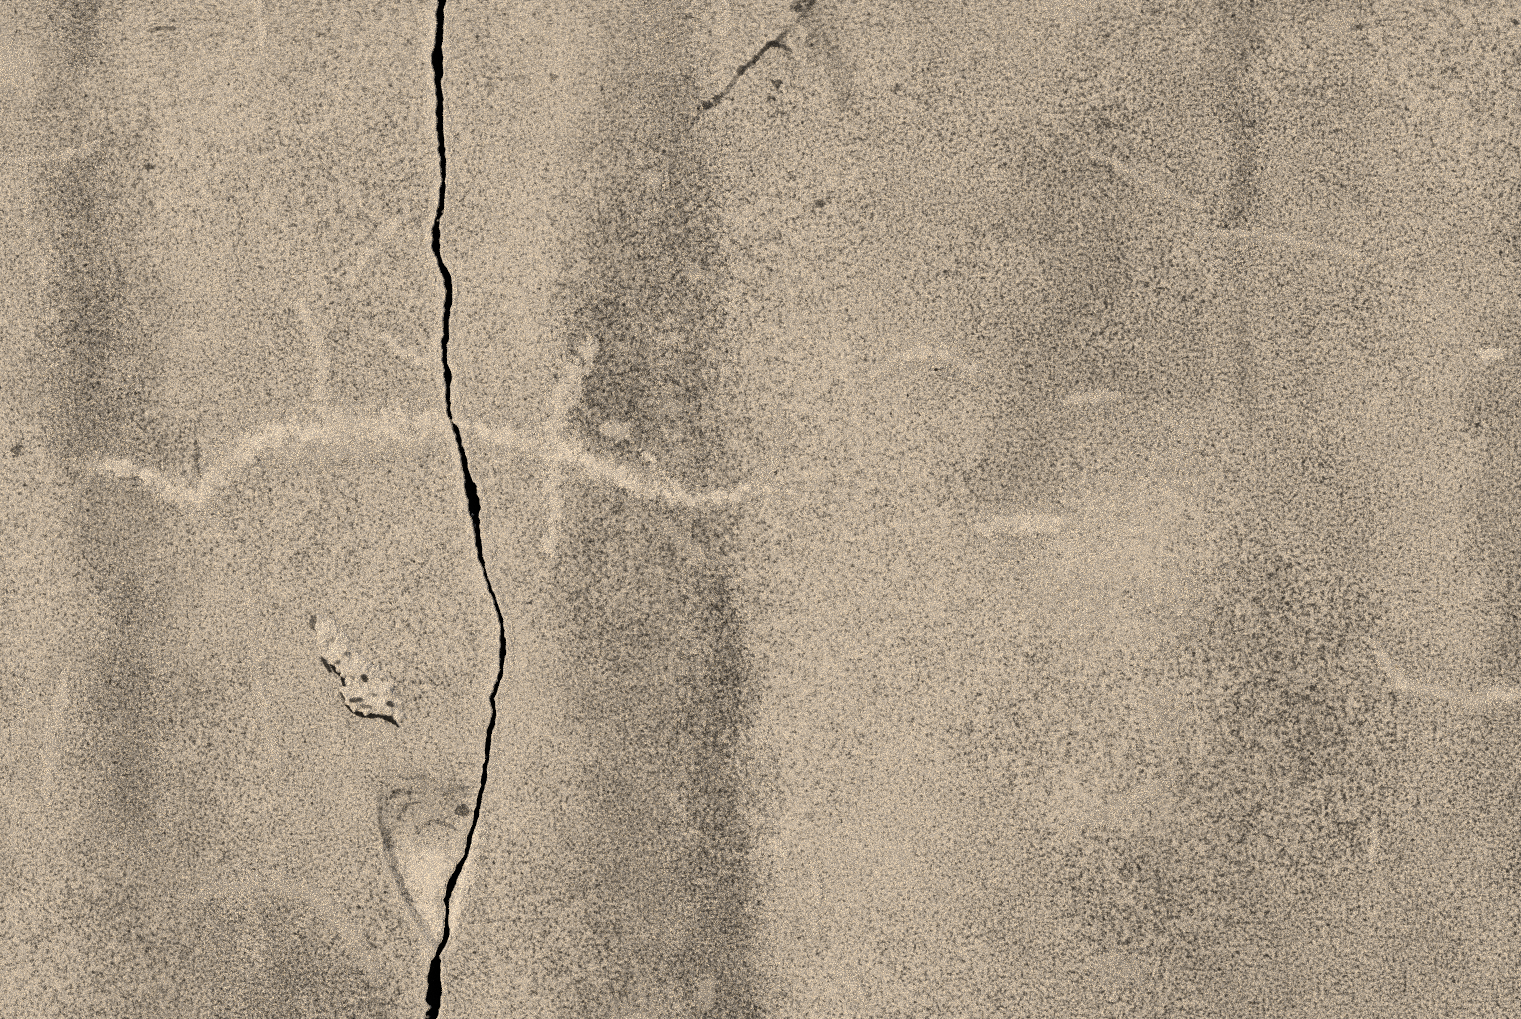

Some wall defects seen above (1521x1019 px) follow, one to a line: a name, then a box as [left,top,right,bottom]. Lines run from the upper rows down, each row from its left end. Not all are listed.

crack [419,0,515,1019]
crack [702,0,815,109]